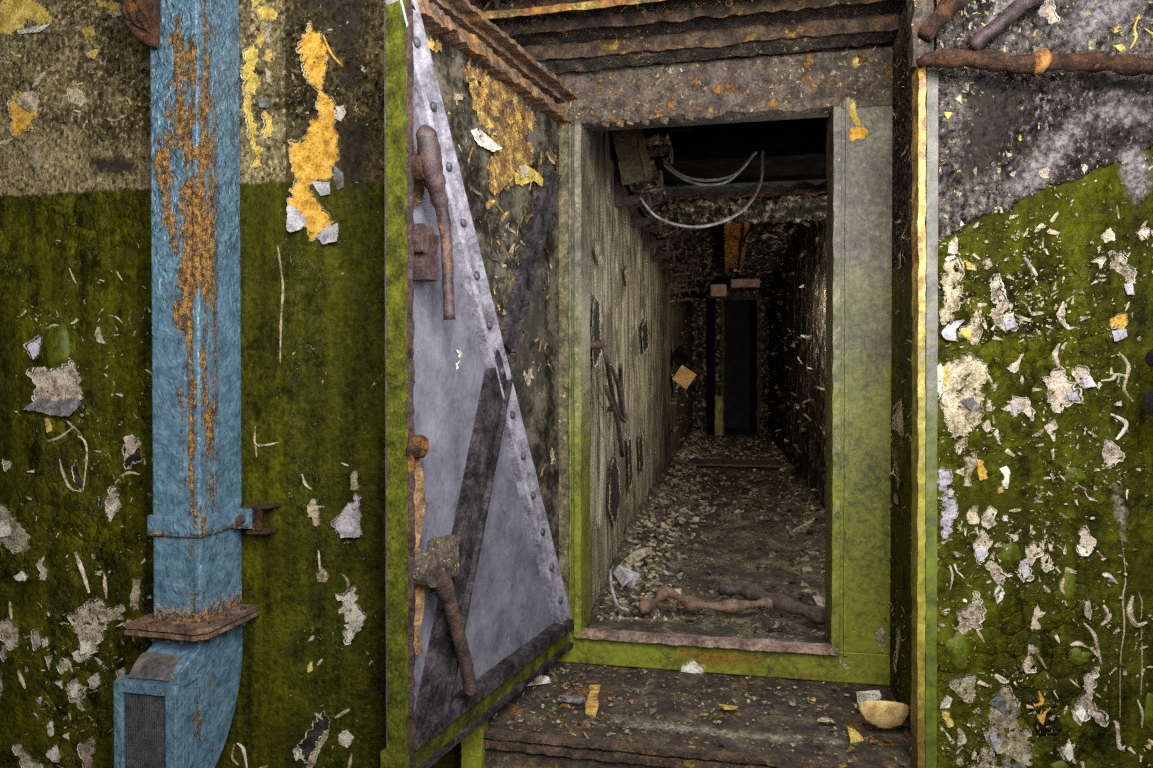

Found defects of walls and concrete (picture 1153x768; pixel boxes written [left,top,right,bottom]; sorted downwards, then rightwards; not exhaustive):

peeling [239,0,346,244]
peeling [471,128,543,196]
peeling [0,502,49,582]
peeling [23,333,88,493]
peeling [98,434,146,523]
peeling [301,463,365,538]
peeling [937,206,1097,643]
peeling [1073,522,1104,558]
peeling [1100,413,1129,470]
peeling [0,552,143,712]
peeling [315,550,370,647]
peeling [940,666,1111,768]